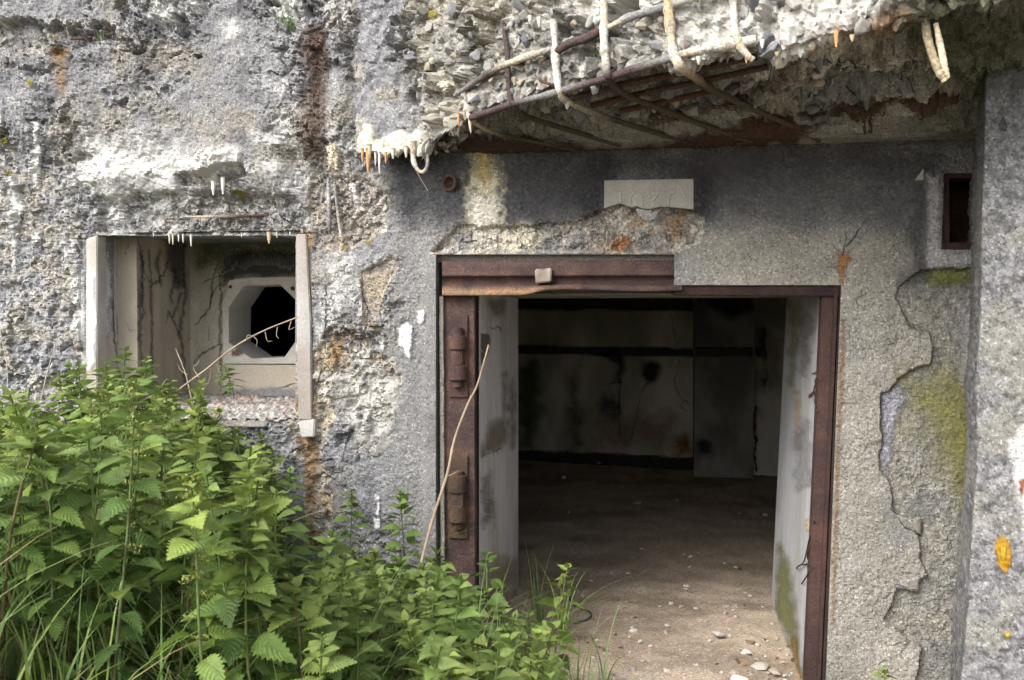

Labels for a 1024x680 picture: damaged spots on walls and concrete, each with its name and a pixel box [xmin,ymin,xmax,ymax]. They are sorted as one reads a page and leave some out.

corrosion [300,26,326,157]
spalling [404,0,821,174]
leakage [568,0,884,76]
corrosion [639,81,961,149]
spalling [921,21,950,83]
leakage [357,90,972,283]
crack [833,216,870,255]
spalling [0,152,393,438]
leakage [599,350,661,442]
corrosion [297,435,321,547]
peeling [878,266,971,680]
corrosion [485,561,518,627]